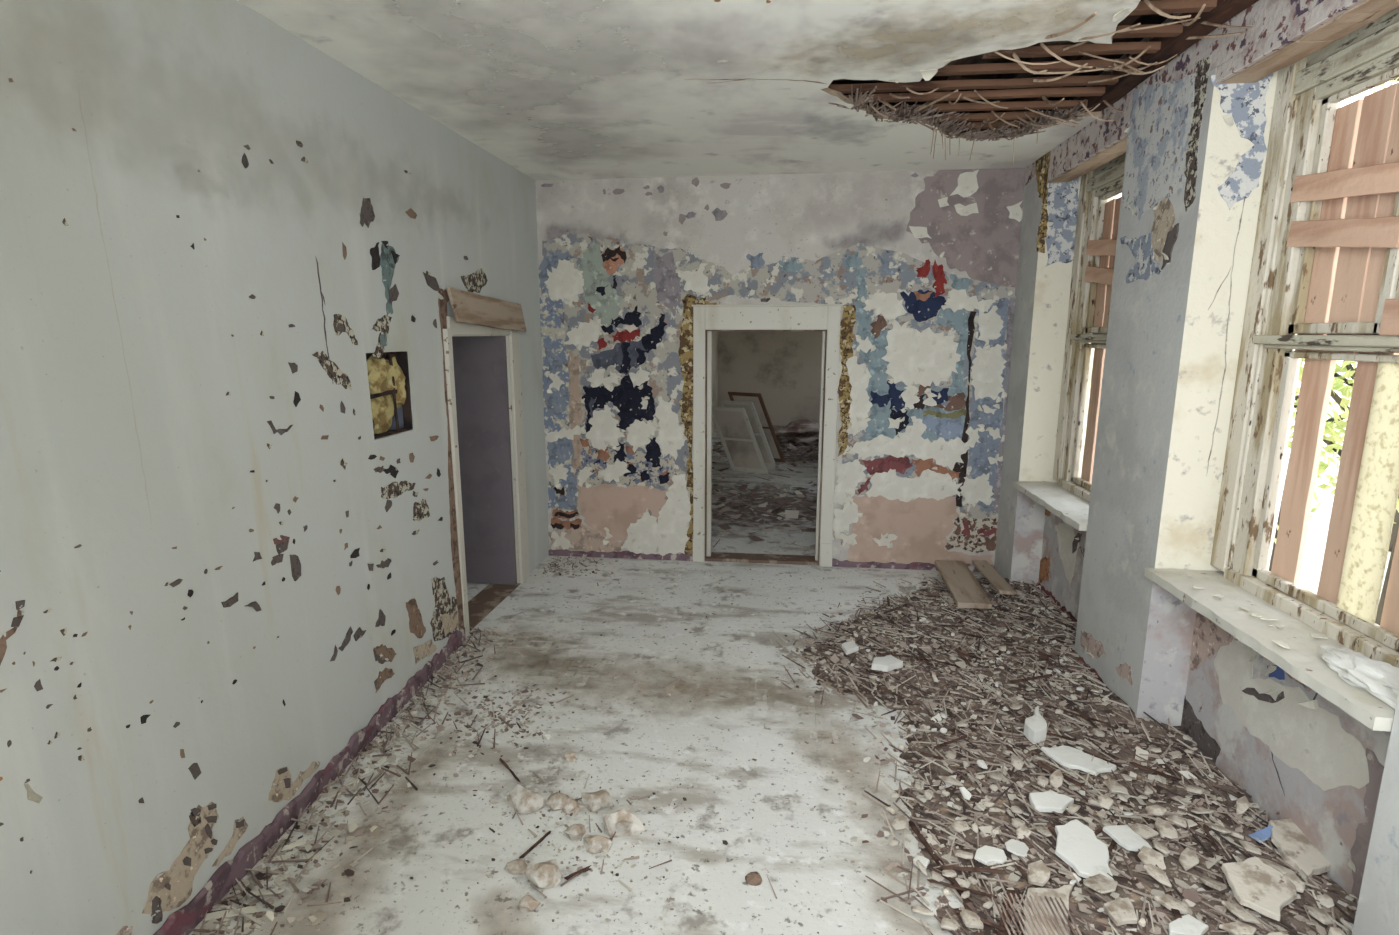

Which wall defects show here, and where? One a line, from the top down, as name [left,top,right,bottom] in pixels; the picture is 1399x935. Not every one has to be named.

peeling [920,56,959,81]
peeling [312,351,356,415]
peeling [359,198,375,228]
peeling [370,241,400,358]
peeling [461,256,488,293]
peeling [544,259,721,559]
peeling [832,151,1079,549]
peeling [1120,56,1273,283]
peeling [330,271,464,693]
peeling [0,600,75,709]
peeling [1181,611,1384,904]
peeling [116,802,248,935]